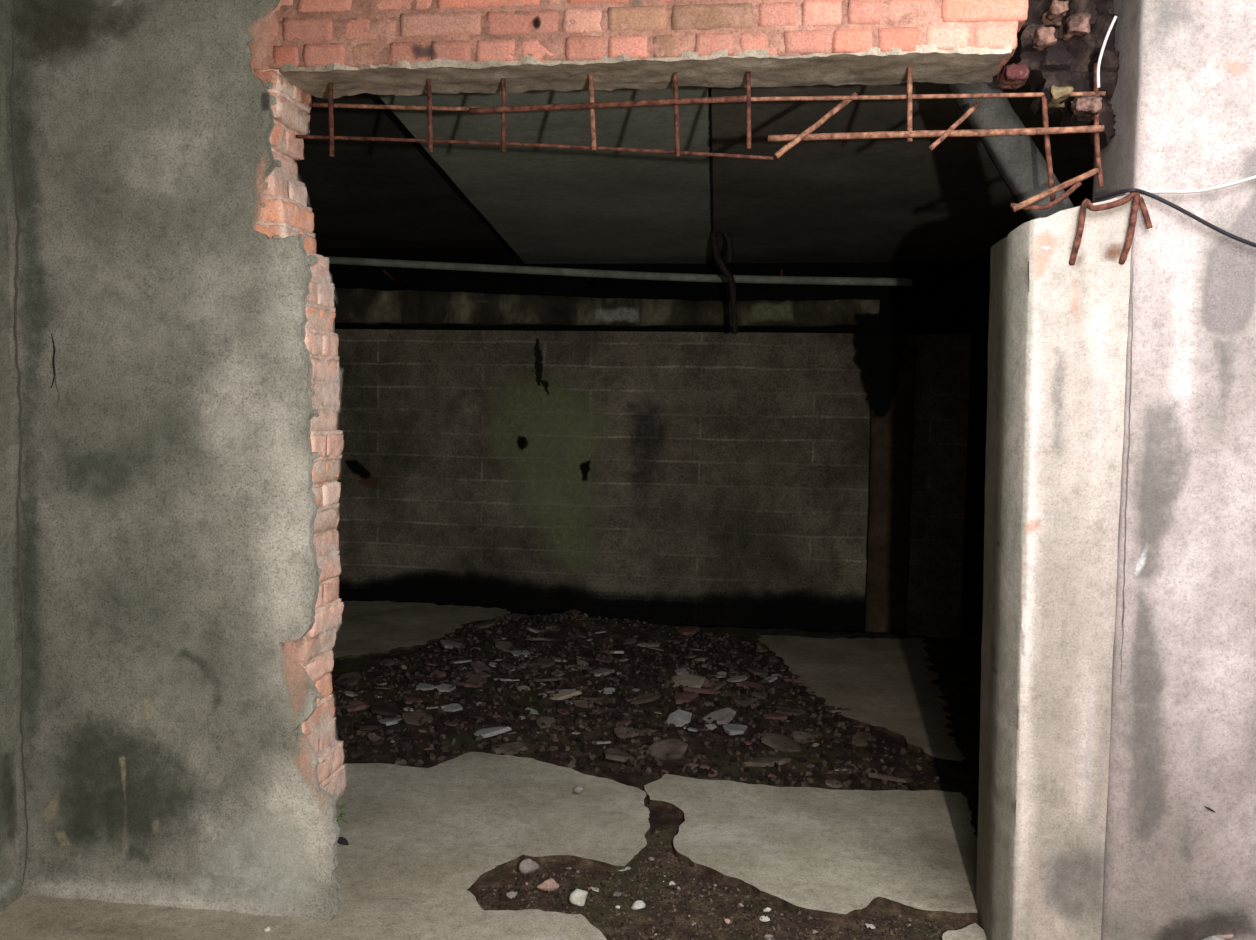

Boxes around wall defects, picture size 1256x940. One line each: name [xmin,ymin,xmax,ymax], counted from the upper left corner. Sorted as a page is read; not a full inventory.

spalling [250,0,1153,801]